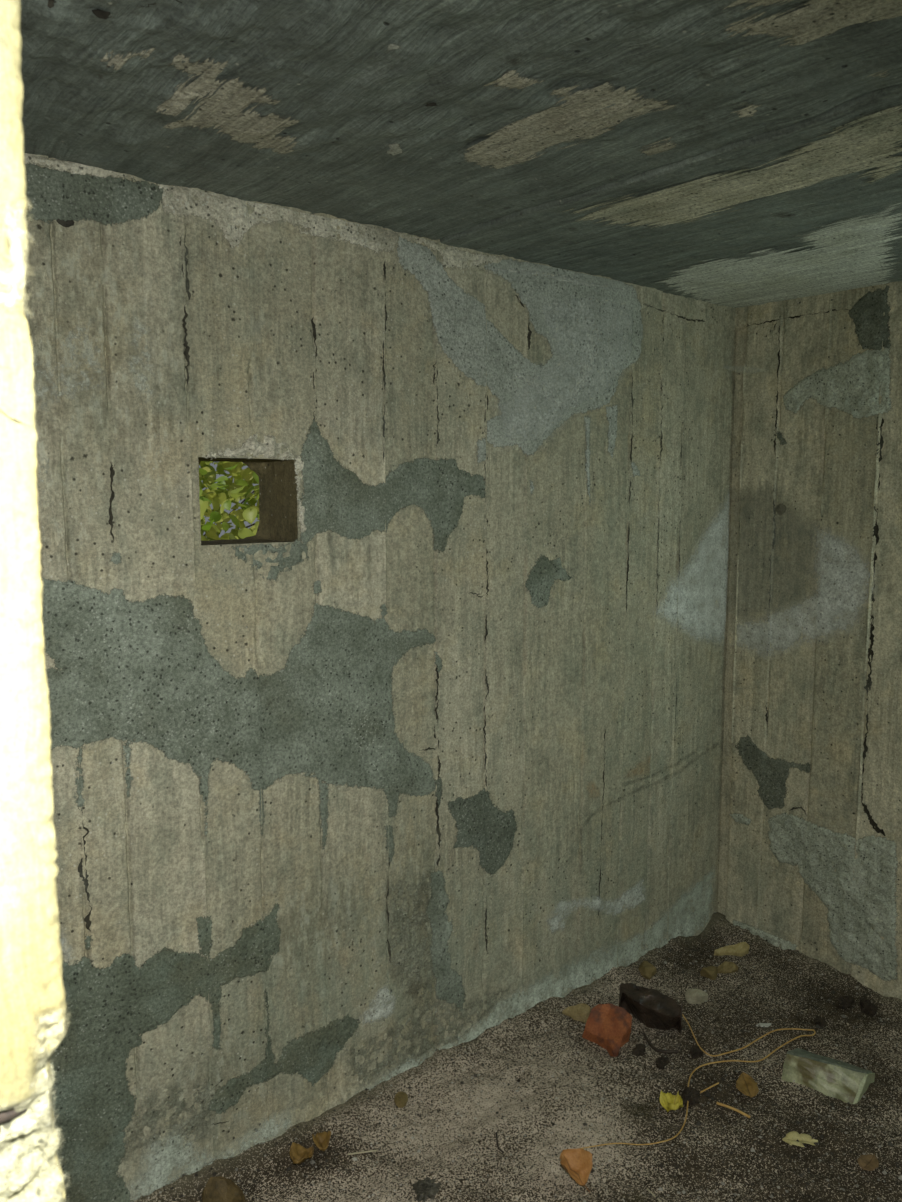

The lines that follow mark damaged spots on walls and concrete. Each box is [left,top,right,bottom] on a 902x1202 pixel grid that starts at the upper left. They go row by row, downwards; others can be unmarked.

peeling [91,48,156,70]
peeling [156,53,300,154]
peeling [464,70,675,170]
peeling [563,105,902,228]
peeling [731,102,761,118]
peeling [723,0,902,47]
peeling [656,202,902,308]
crack [860,418,886,836]
spalling [0,1008,67,1202]